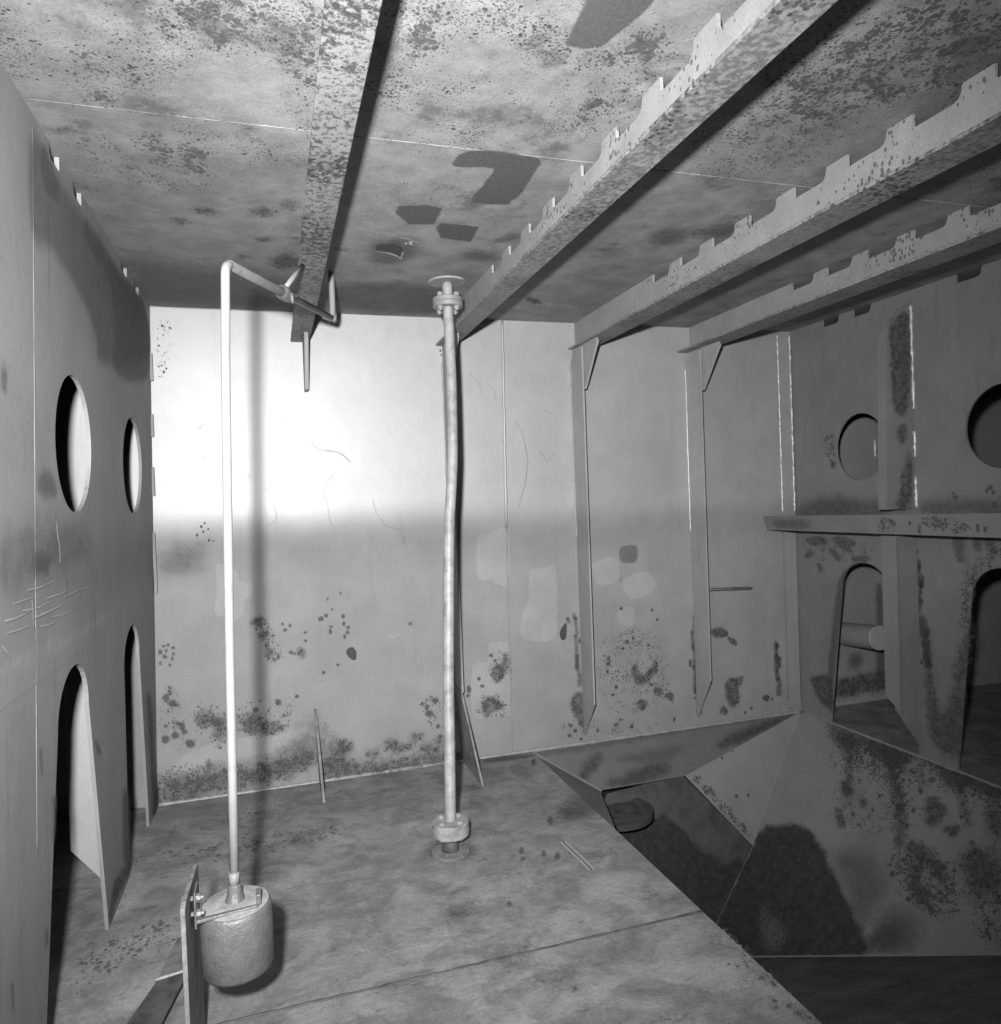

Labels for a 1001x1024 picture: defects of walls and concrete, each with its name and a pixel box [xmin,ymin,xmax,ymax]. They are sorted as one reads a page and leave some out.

rust [105,0,373,138]
rust [378,0,458,111]
rust [59,126,219,194]
spalling [376,237,418,262]
rust [889,312,911,443]
rust [895,461,913,509]
rust [250,617,307,663]
rust [148,687,462,815]
rust [559,627,673,740]
rust [762,643,781,701]
rust [800,513,1001,950]
rust [76,918,177,996]